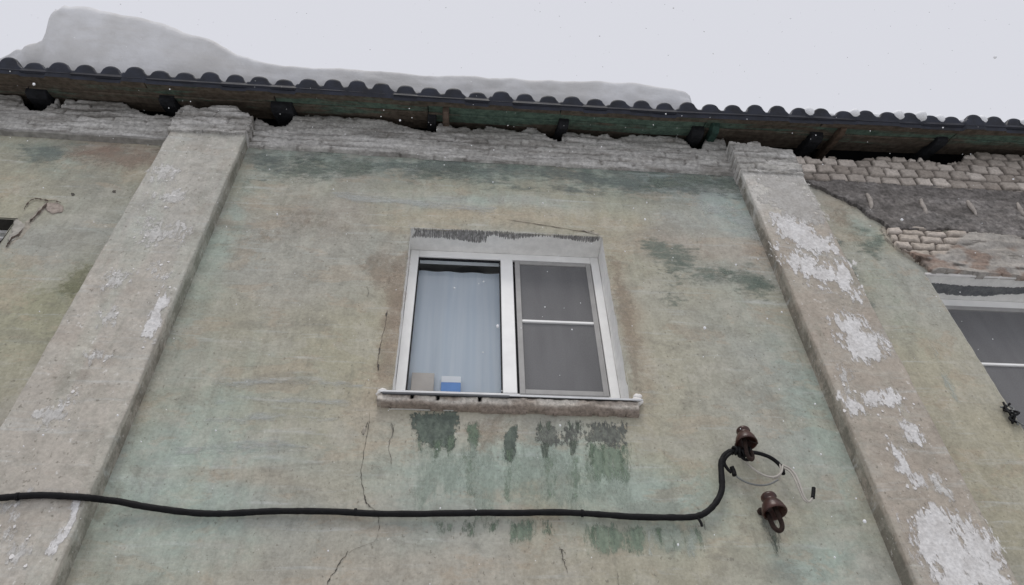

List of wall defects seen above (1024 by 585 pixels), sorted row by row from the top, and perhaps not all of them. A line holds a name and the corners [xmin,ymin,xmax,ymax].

flaking render [8,219,25,242]
peeling [101,260,173,348]
flaking render [747,152,1024,585]
crack [327,414,394,584]
damp [410,411,479,458]
damp [504,425,518,501]
damp [536,420,630,498]